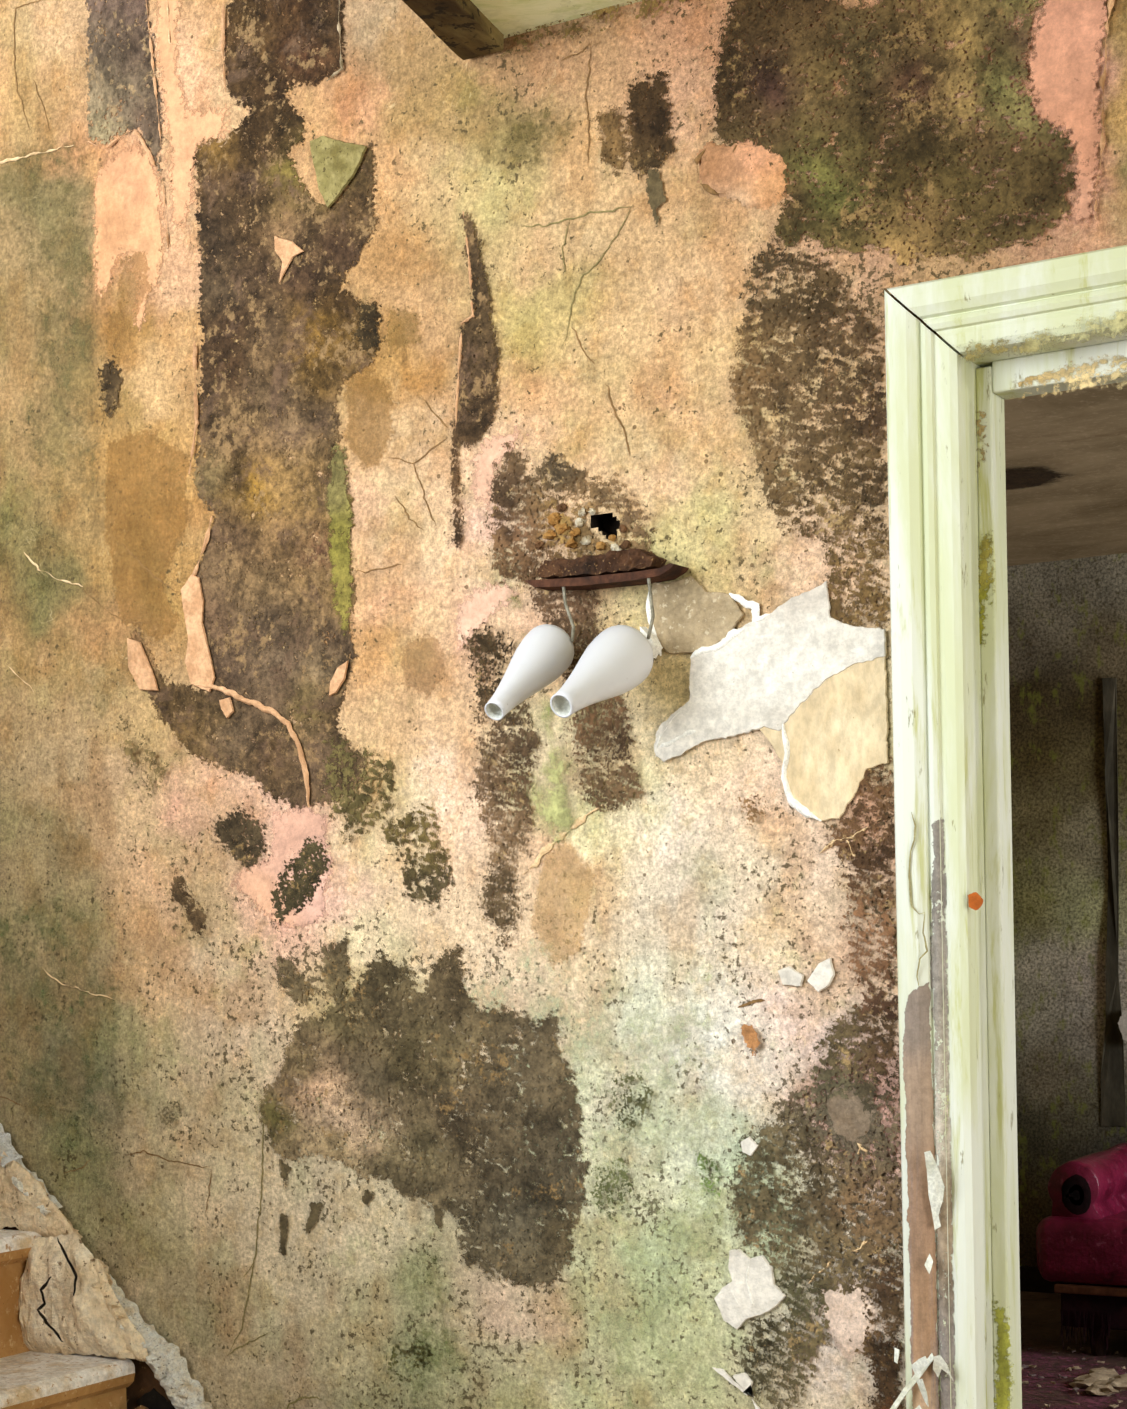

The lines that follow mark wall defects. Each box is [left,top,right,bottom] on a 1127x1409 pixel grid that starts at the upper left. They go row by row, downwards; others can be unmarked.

water stain [501,0,686,57]
water stain [591,60,676,227]
water stain [707,0,1080,628]
flaking render [534,503,632,551]
mould [318,728,455,916]
peeling [454,571,605,947]
peeling [563,691,644,817]
flaking render [640,575,889,822]
water stain [254,931,654,1288]
mould [695,757,906,1409]
flaking render [109,1274,213,1409]
flaking render [714,1249,786,1330]